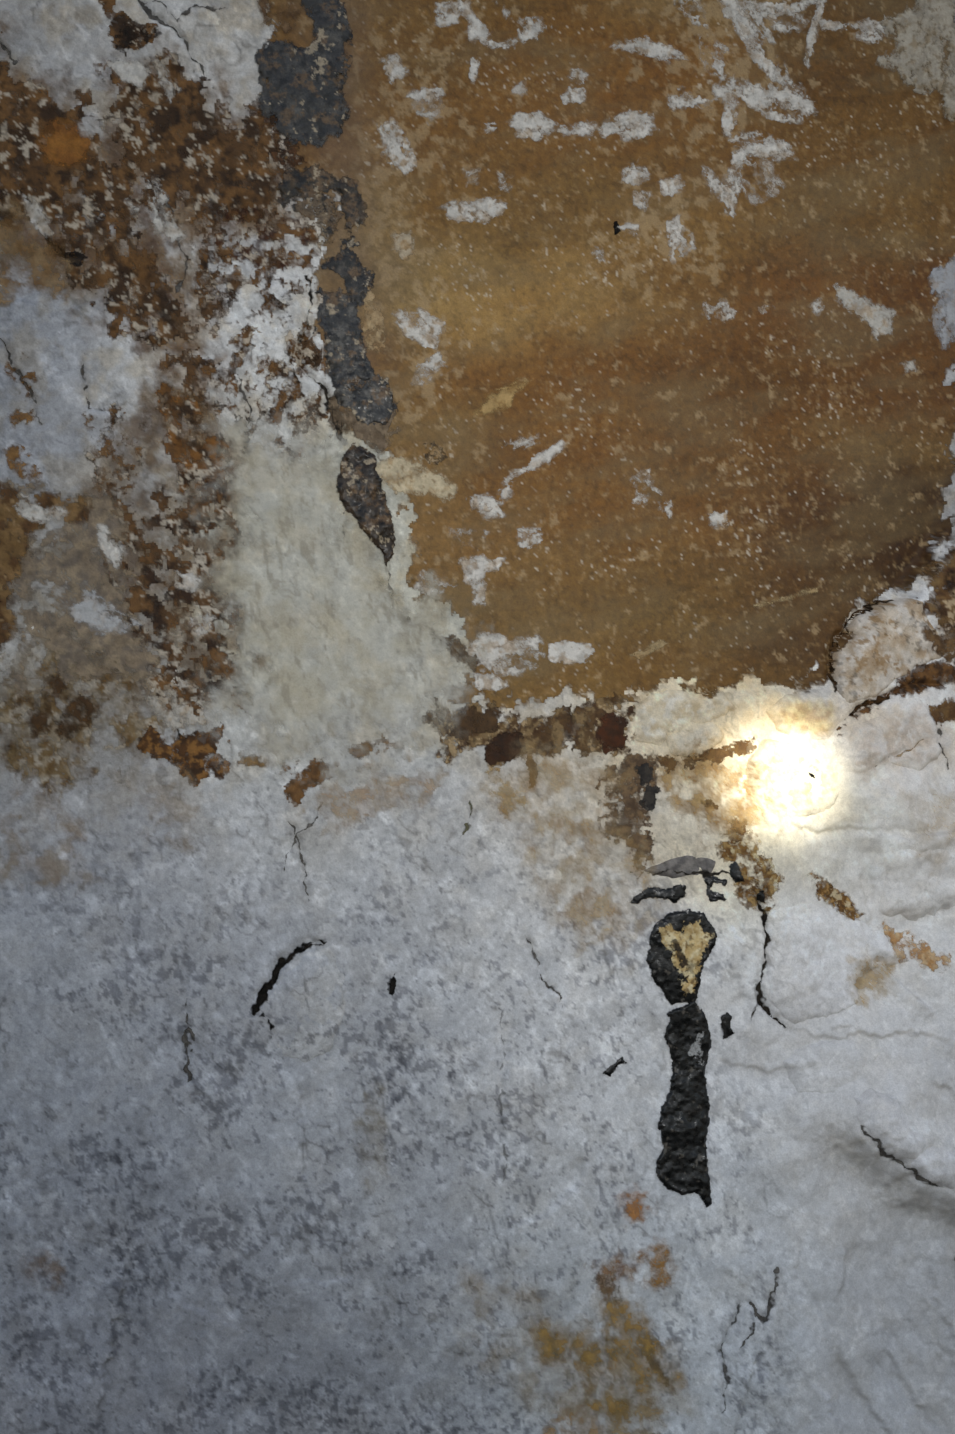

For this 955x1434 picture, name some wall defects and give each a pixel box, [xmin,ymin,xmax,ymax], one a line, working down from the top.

spalling [435,0,545,82]
spalling [485,110,655,141]
peeling [668,0,955,217]
spalling [444,174,507,223]
spalling [811,284,895,339]
corrosion [0,0,955,912]
spalling [147,419,595,777]
corrosion [810,873,864,920]
crack [251,940,326,1038]
water stain [670,939,689,980]
corrosion [854,922,952,1003]
crack [861,1125,940,1187]